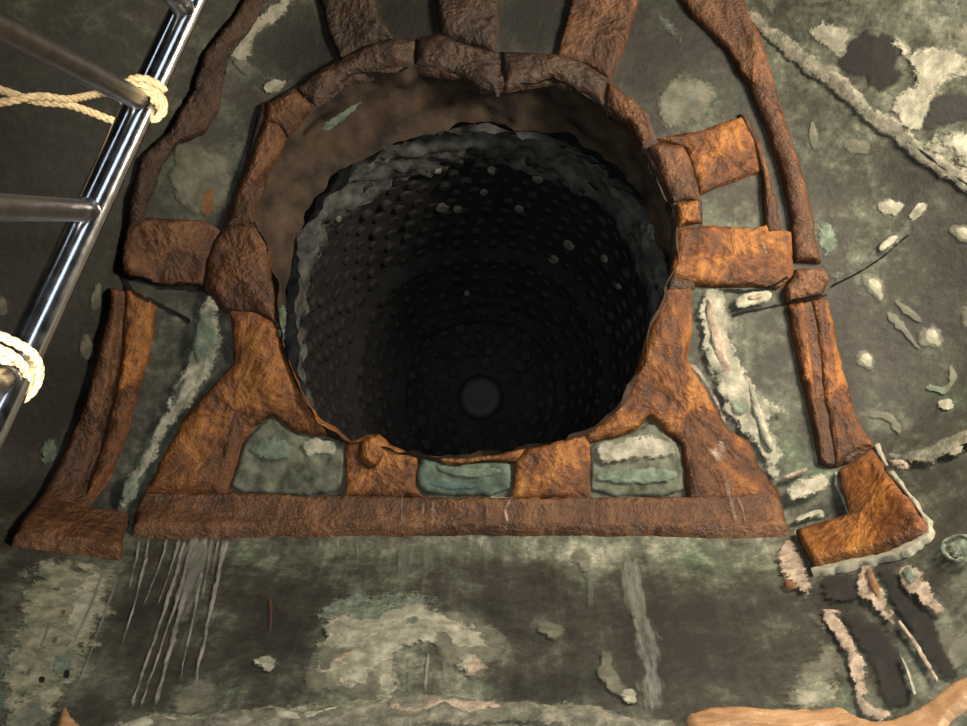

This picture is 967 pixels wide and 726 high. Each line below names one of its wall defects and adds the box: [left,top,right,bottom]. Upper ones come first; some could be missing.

crack [909,142,967,185]
crack [116,257,205,323]
crack [720,235,909,317]
water stain [130,543,150,599]
water stain [158,540,228,713]
water stain [622,561,661,707]
water stain [133,636,175,702]